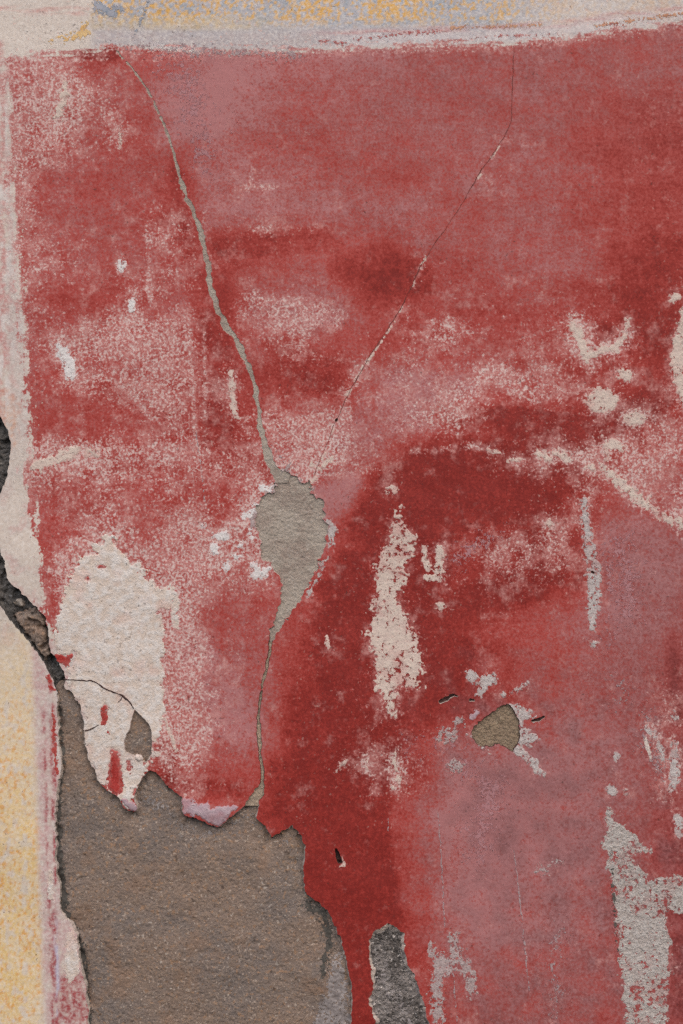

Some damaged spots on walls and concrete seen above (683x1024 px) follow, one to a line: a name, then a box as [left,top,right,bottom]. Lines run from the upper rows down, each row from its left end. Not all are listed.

crack [116,50,514,483]
spalling [0,417,11,493]
crack [0,552,134,709]
spalling [53,534,353,1024]
crack [245,634,273,806]
spalling [199,460,329,642]
peeling [361,504,427,719]
spalling [466,704,545,755]
spalling [369,923,430,1024]
flaking render [600,806,683,1024]